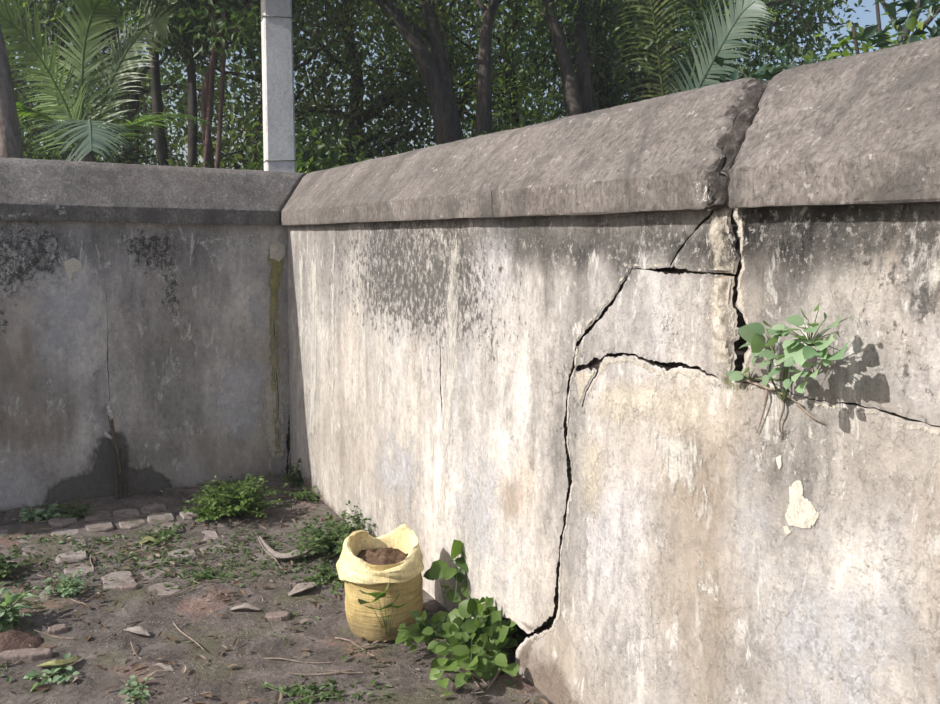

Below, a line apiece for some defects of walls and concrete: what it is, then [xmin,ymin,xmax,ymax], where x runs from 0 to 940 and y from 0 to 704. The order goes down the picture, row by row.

damp [0,232,63,290]
peeling [0,230,83,300]
crack [528,209,940,641]
damp [45,432,172,505]
peeling [782,480,819,535]